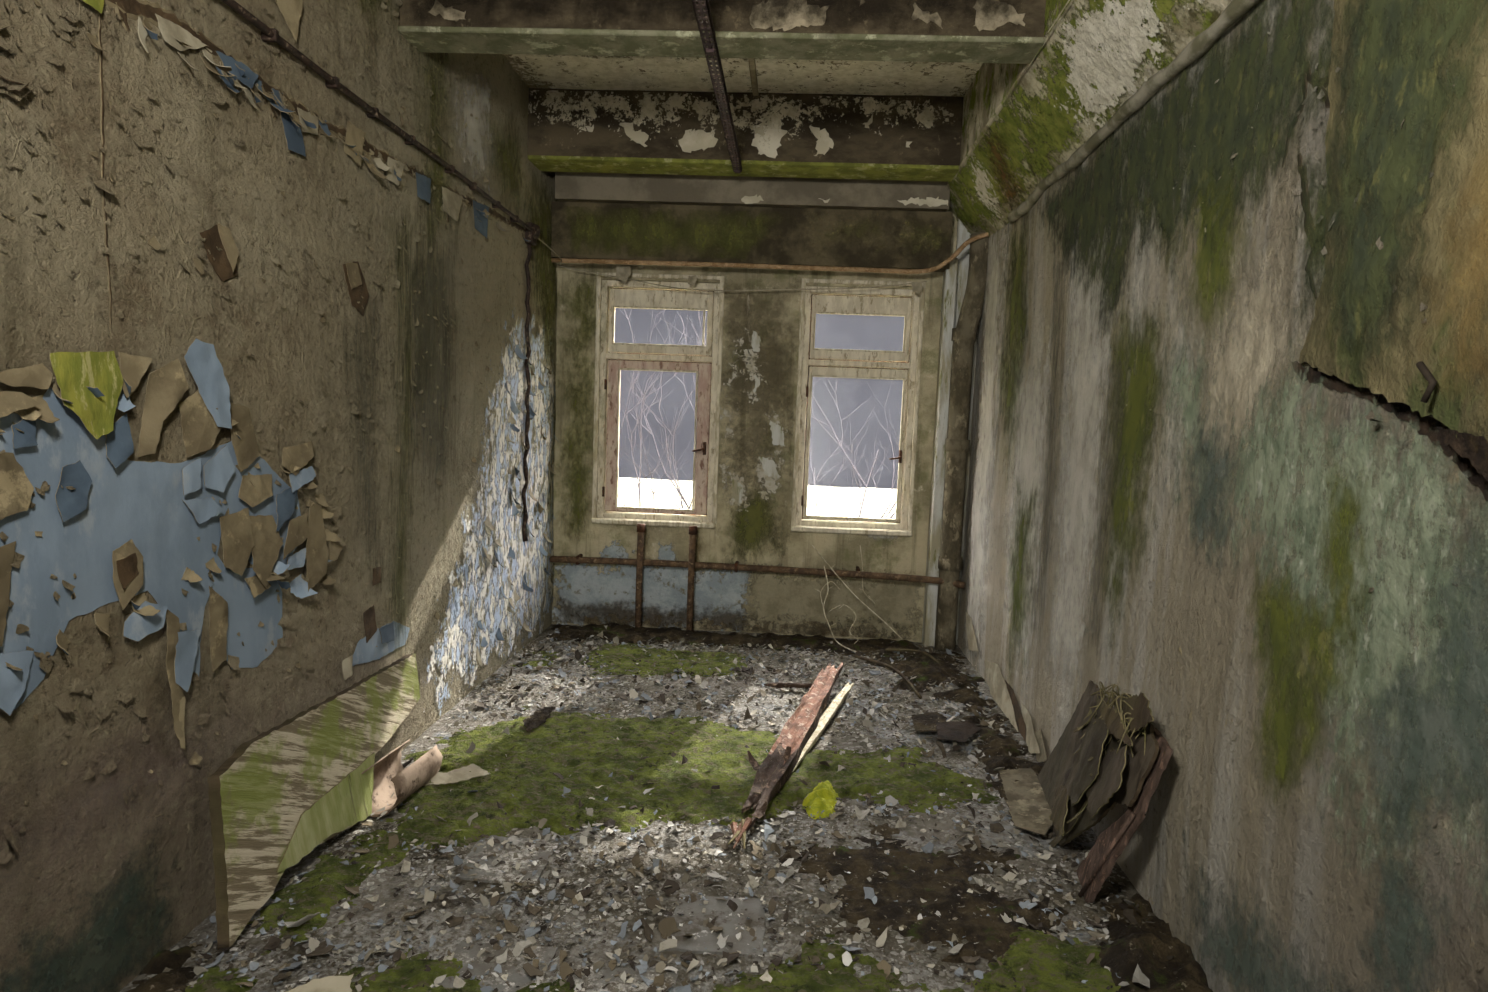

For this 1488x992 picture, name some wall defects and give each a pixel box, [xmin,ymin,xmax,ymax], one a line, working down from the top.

peeling [750,0,828,31]
peeling [912,3,943,29]
peeling [973,0,1025,31]
peeling [508,54,983,158]
peeling [896,197,948,207]
peeling [0,338,343,750]
peeling [342,605,410,680]
damp [547,390,556,547]
peeling [422,299,922,718]
damp [724,295,789,556]
damp [964,229,1007,655]
damp [1007,161,1488,992]